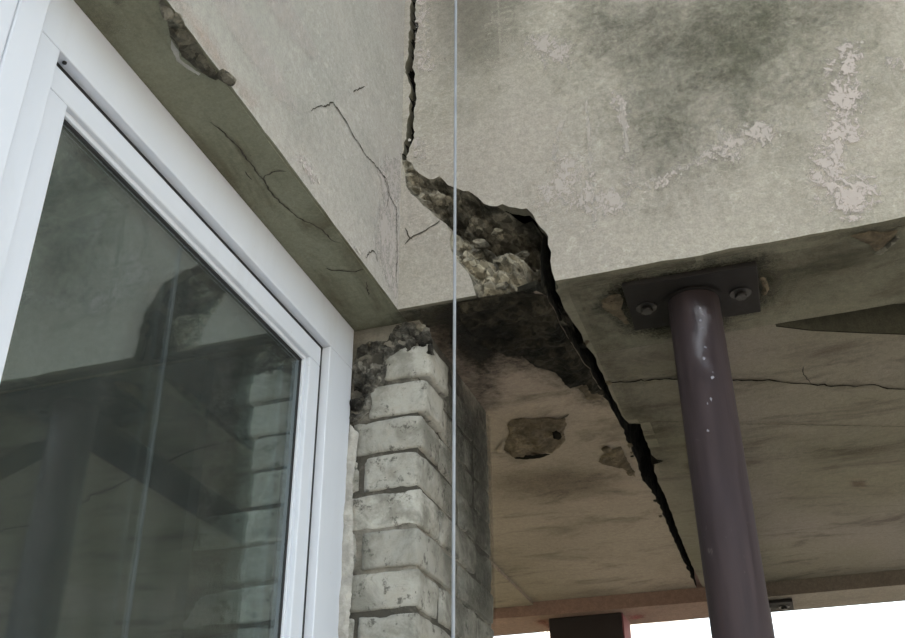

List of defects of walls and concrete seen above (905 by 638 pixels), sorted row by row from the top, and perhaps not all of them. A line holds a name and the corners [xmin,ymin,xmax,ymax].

spalling [159,0,236,86]
crack [213,124,340,243]
crack [311,102,440,295]
crack [402,0,419,158]
spalling [375,89,782,400]
peeling [806,38,882,222]
spalling [349,322,434,424]
leakage [451,402,490,542]
leakage [404,290,593,396]
spalling [496,414,569,460]
crack [541,232,695,579]
crack [733,366,905,390]